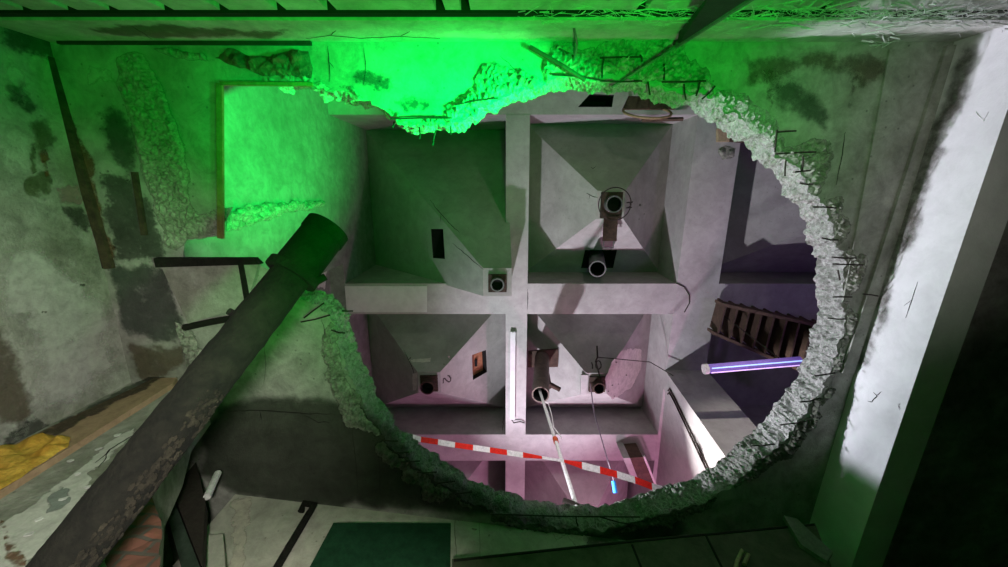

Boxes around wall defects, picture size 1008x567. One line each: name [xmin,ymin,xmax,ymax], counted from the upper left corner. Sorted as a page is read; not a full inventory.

water stain [0,108,184,445]
spalling [225,200,326,231]
spalling [279,39,879,546]
water stain [750,54,885,89]
water stain [877,50,974,322]